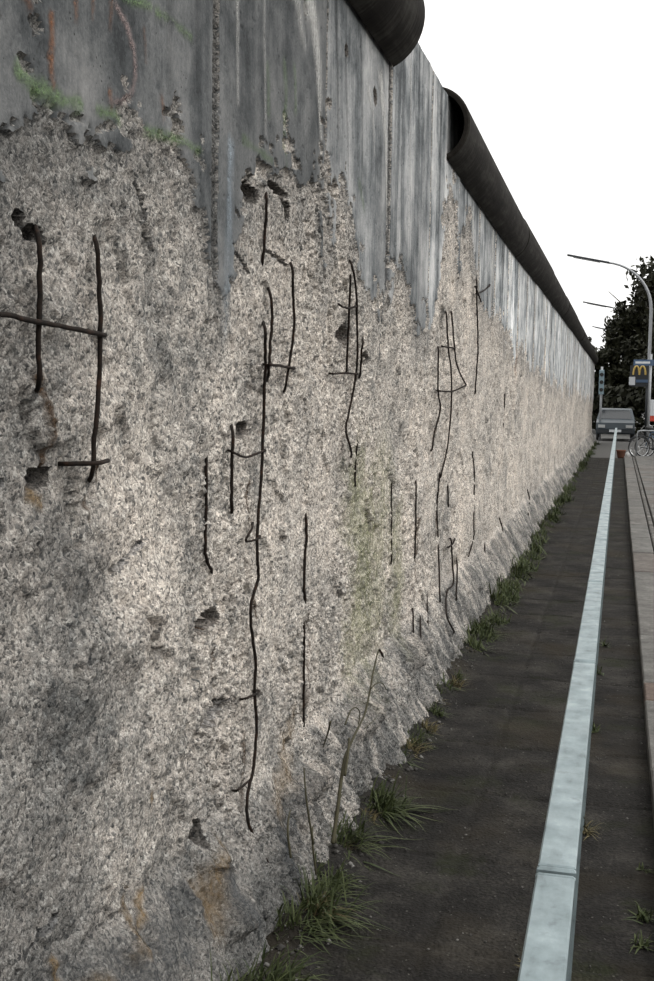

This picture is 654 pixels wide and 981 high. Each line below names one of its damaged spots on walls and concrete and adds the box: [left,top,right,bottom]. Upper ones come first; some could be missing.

leakage [303,0,320,86]
rust [35,374,59,467]
spalling [0,74,327,981]
spalling [303,140,596,863]